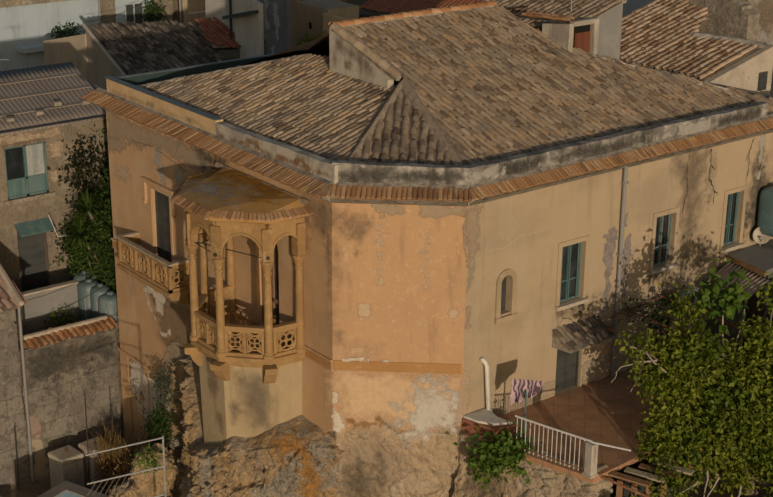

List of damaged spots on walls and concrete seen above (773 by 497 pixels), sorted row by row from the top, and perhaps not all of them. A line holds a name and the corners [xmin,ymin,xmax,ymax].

crack [709,148,718,204]
leakage [746,135,767,234]
peeling [142,285,171,337]
peeling [130,361,171,434]
peeling [331,392,345,432]
peeling [383,373,463,442]